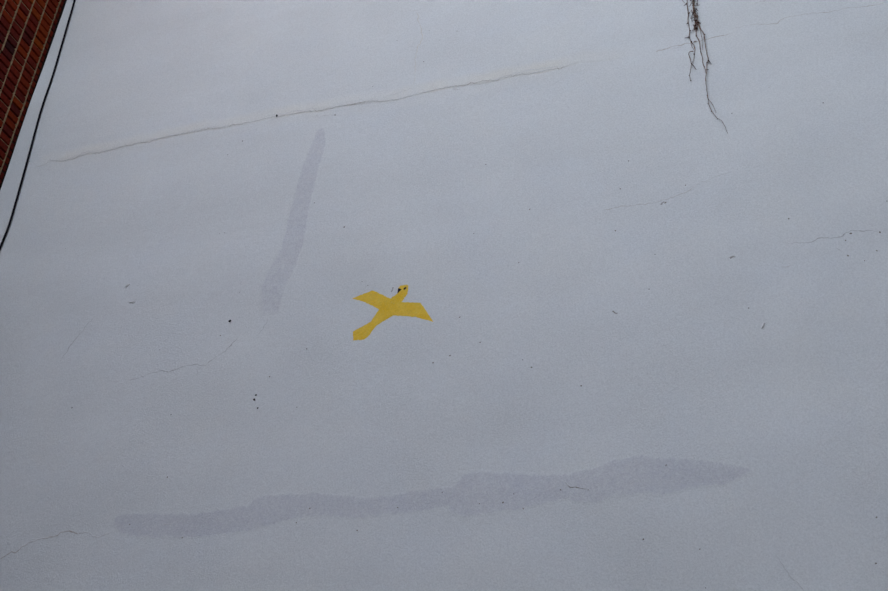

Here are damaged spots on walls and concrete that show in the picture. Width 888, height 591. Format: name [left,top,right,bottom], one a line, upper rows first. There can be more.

crack [41,62,577,166]
leakage [258,126,328,317]
leakage [112,452,754,541]